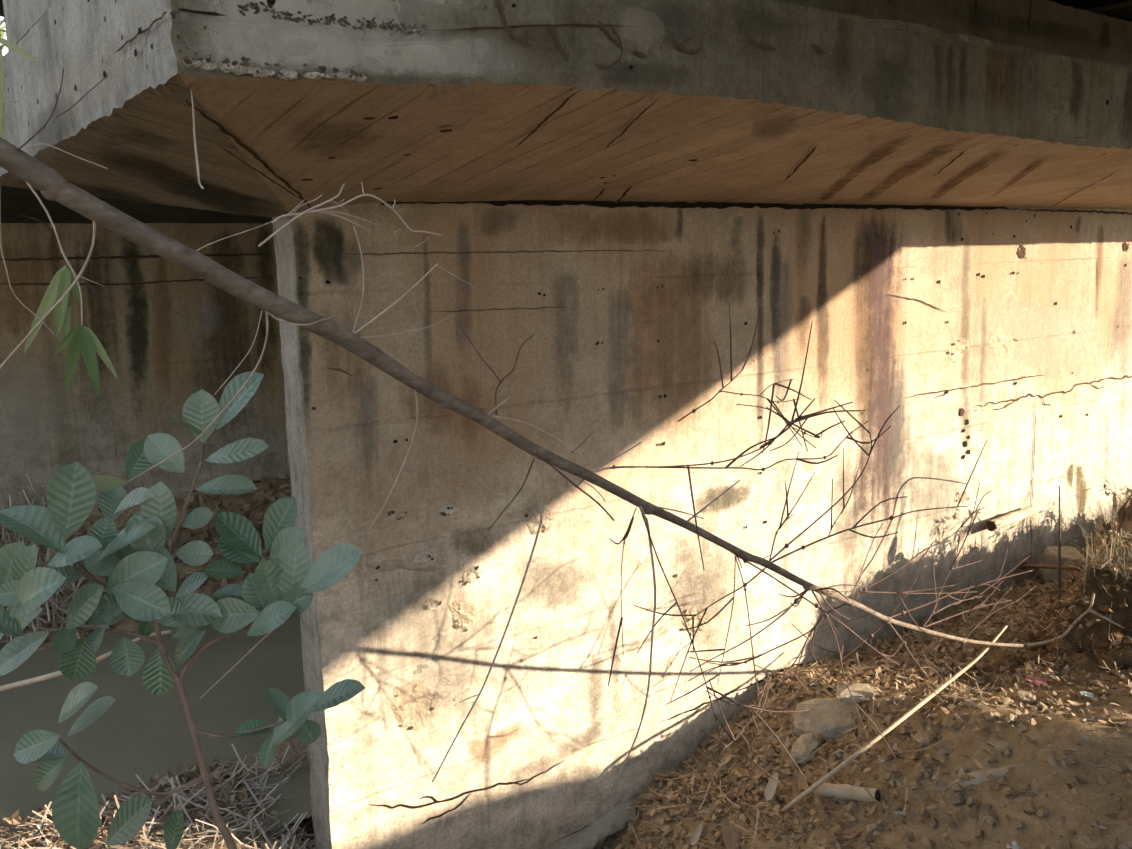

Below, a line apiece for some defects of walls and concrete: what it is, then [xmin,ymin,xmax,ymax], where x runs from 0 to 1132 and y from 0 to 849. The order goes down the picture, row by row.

crack [114,9,225,54]
spalling [170,0,367,82]
peeling [237,1,427,36]
crack [381,145,1132,215]
leakage [85,238,148,380]
leakage [758,222,779,394]
leakage [818,224,828,367]
leakage [854,218,904,534]
leakage [700,487,747,509]
crack [905,375,1132,542]
crack [661,654,807,725]
crack [370,761,564,825]